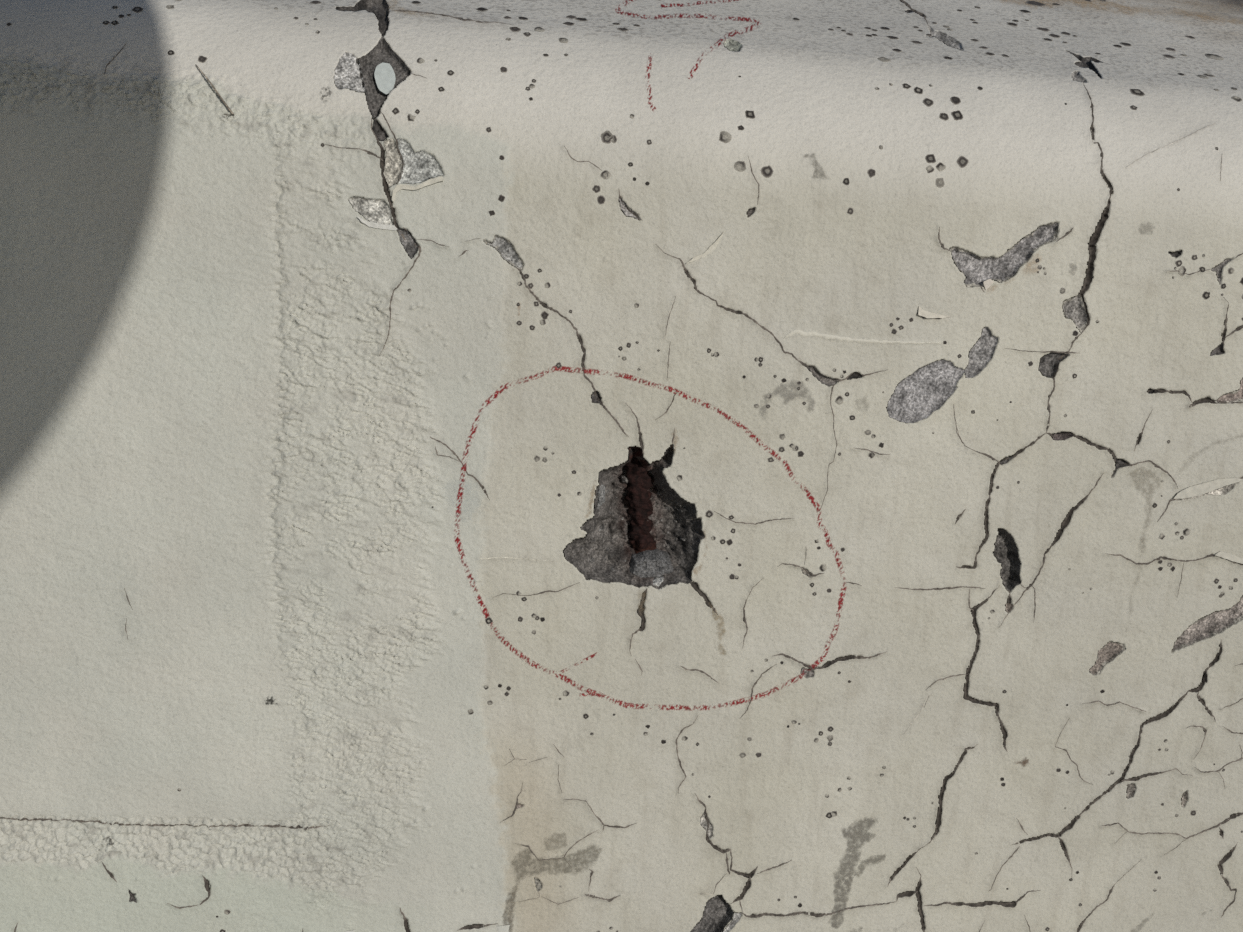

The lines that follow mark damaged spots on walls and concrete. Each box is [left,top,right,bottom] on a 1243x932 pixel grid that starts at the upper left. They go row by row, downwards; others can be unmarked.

crack [324,0,627,436]
spalling [938,222,1074,292]
spalling [887,327,998,423]
crack [430,437,490,500]
crack [657,50,1243,932]
crack [493,582,580,598]
spalling [564,405,718,675]
spalling [993,529,1021,612]
spalling [1089,641,1125,675]
spalling [1171,595,1243,654]
crack [501,744,636,905]
spalling [691,895,743,932]